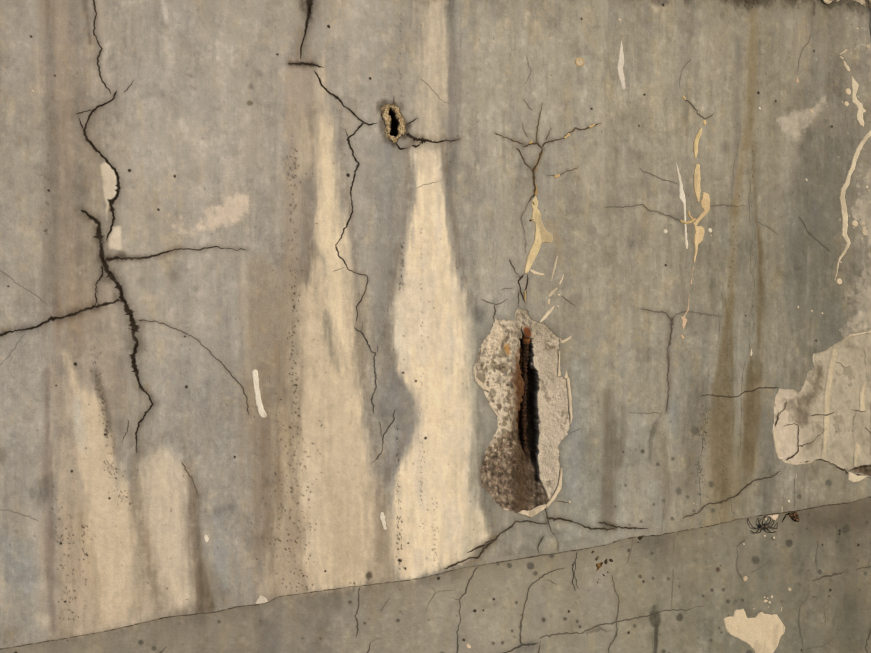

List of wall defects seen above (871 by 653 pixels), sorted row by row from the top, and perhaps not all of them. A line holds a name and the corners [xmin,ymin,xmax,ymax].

crack [0,0,249,453]
leakage [28,346,222,652]
crack [288,0,395,462]
leakage [250,0,500,611]
crack [395,118,459,150]
crack [0,471,871,653]
corrosion [502,325,533,432]
spalling [474,308,573,518]
crack [481,55,601,321]
peeling [724,607,785,653]
peeling [775,94,831,143]
spalling [772,146,871,482]